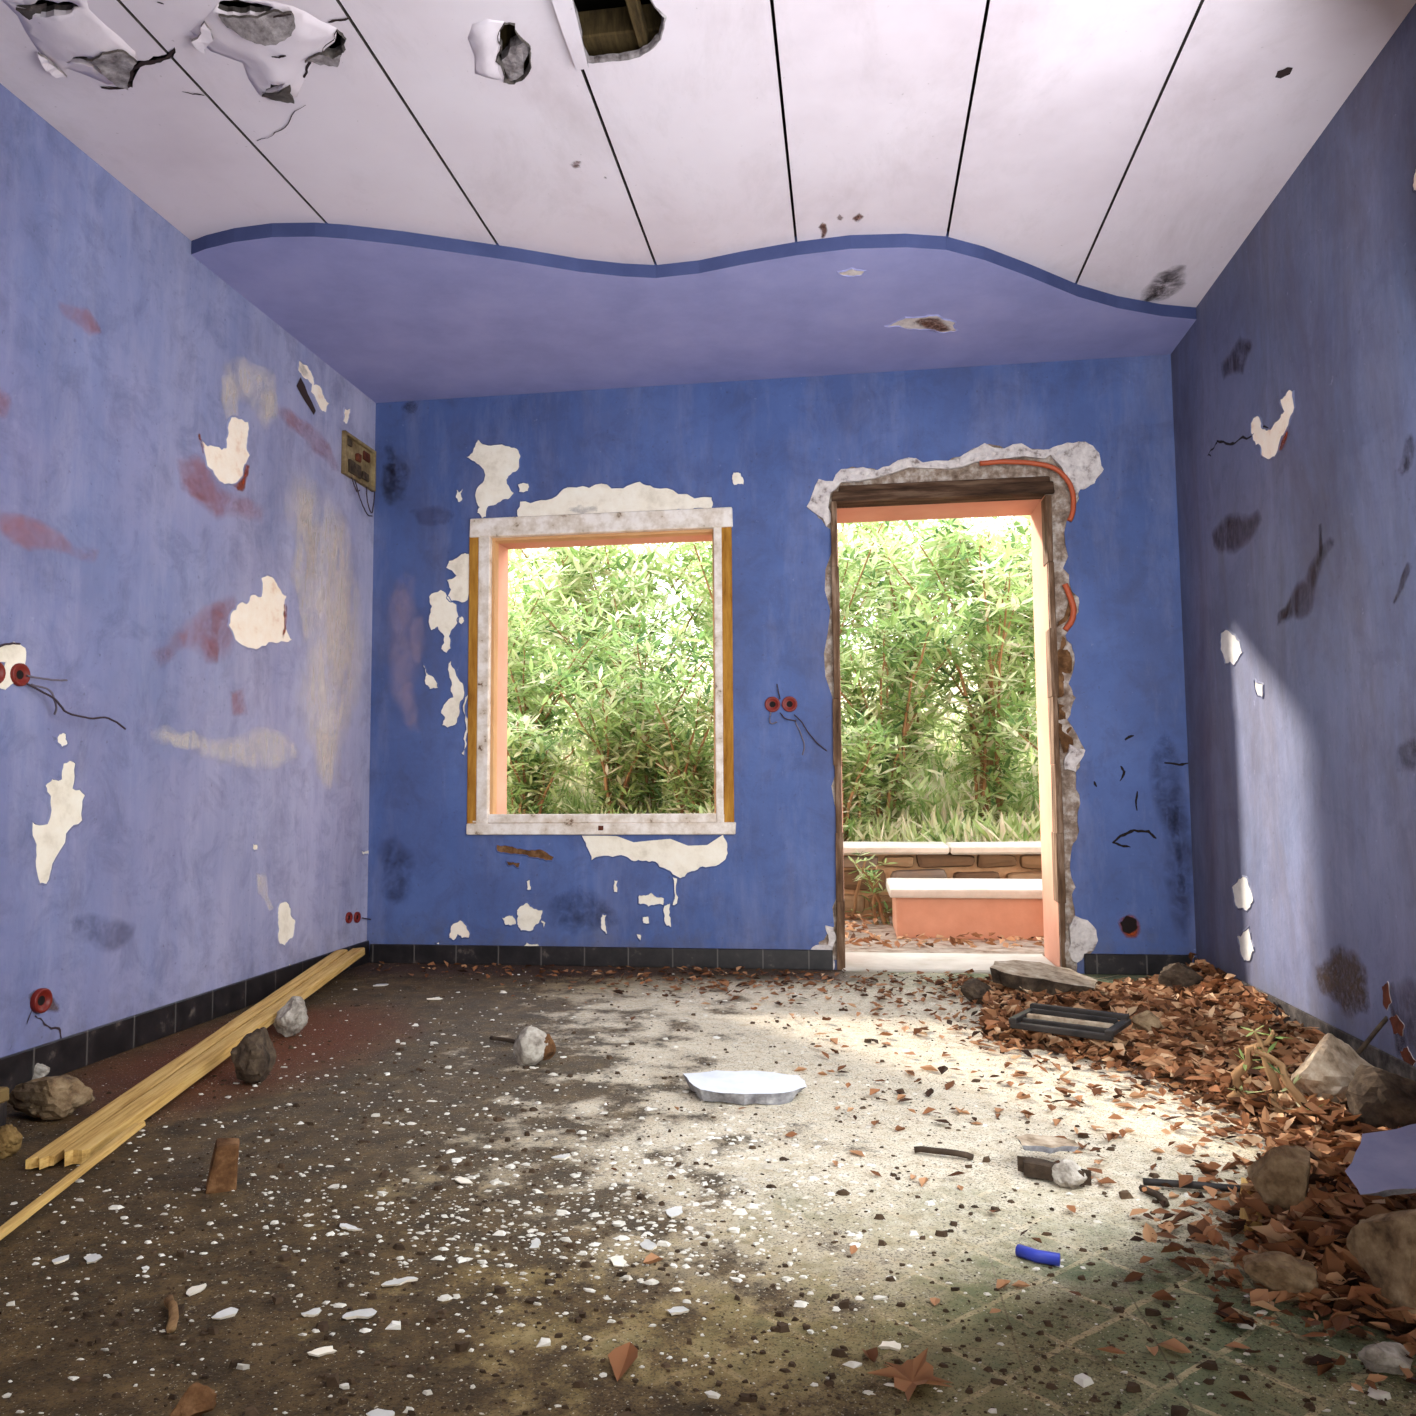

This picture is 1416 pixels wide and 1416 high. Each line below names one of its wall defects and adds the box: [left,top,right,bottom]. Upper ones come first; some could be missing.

peeling [199,415,251,490]
peeling [455,439,714,518]
peeling [1250,388,1296,461]
peeling [227,574,292,651]
peeling [422,552,469,756]
flaking render [807,442,1104,972]
peeling [30,731,86,886]
peeling [581,834,729,942]